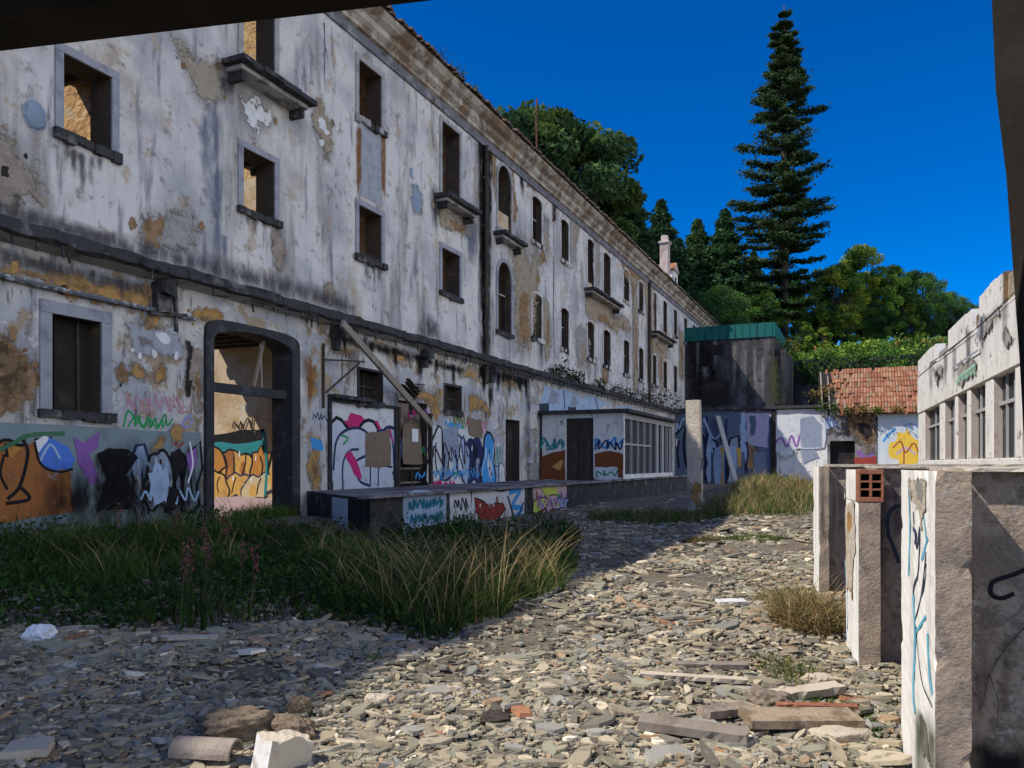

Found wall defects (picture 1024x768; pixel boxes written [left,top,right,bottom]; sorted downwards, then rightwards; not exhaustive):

spalling [170,34,277,147]
leakage [66,144,102,182]
leakage [202,118,219,160]
peeling [312,97,335,163]
spalling [128,208,206,253]
leakage [0,176,351,310]
spalling [409,167,476,240]
spalling [0,261,203,418]
peeling [908,476,926,529]